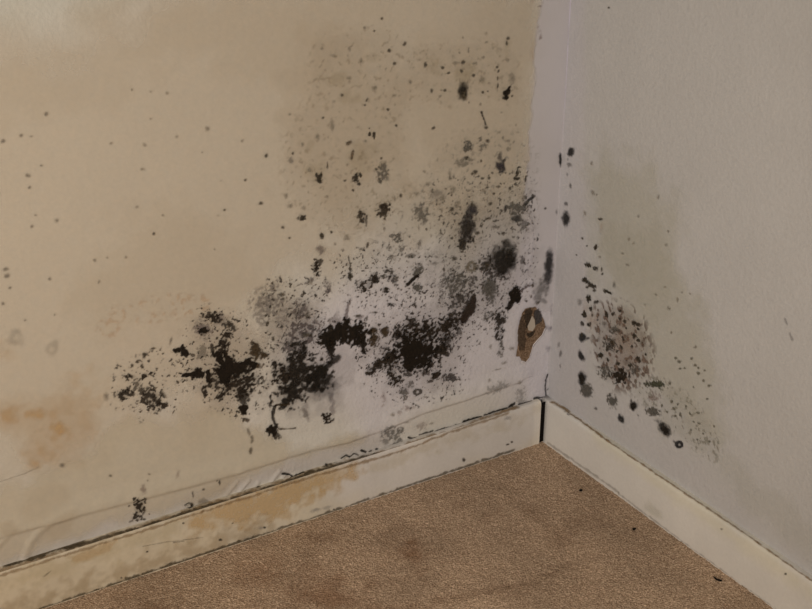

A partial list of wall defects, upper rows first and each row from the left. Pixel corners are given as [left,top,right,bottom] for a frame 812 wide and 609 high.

mould [458,82,469,103]
water stain [375,157,389,183]
water stain [471,140,514,179]
water stain [504,196,534,222]
mould [578,277,671,405]
water stain [0,202,553,567]
peeling [1,307,546,561]